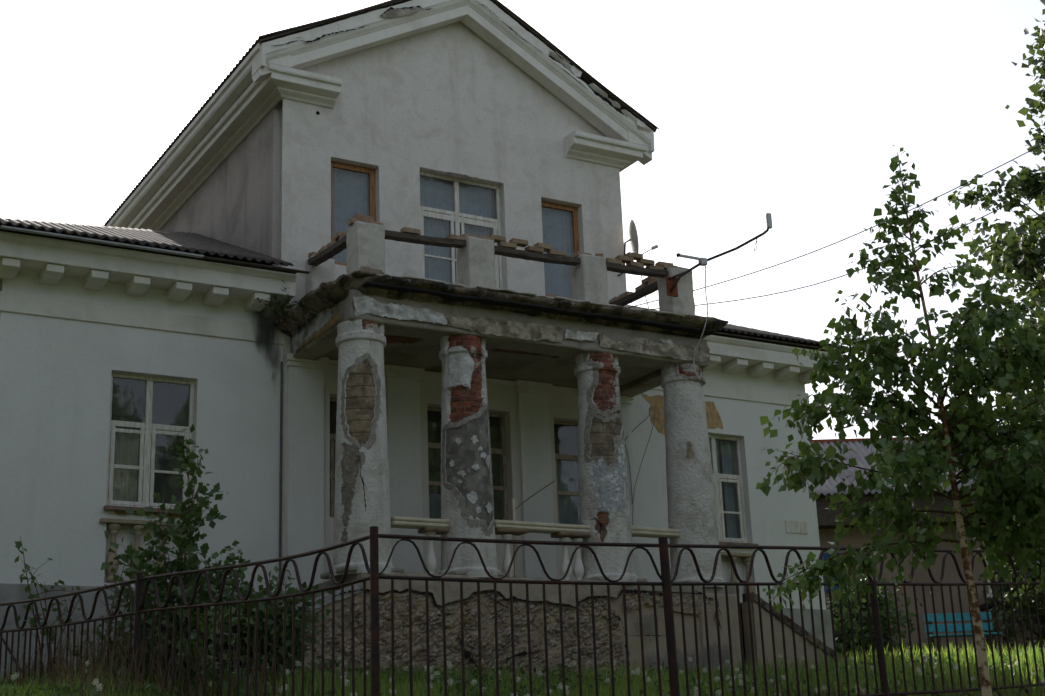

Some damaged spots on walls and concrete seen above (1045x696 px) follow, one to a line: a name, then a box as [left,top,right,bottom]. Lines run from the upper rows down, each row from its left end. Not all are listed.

flaking render [380,6,433,18]
peeling [353,295,710,542]
peeling [705,401,723,429]
flaking render [340,353,381,548]
crack [355,456,368,511]